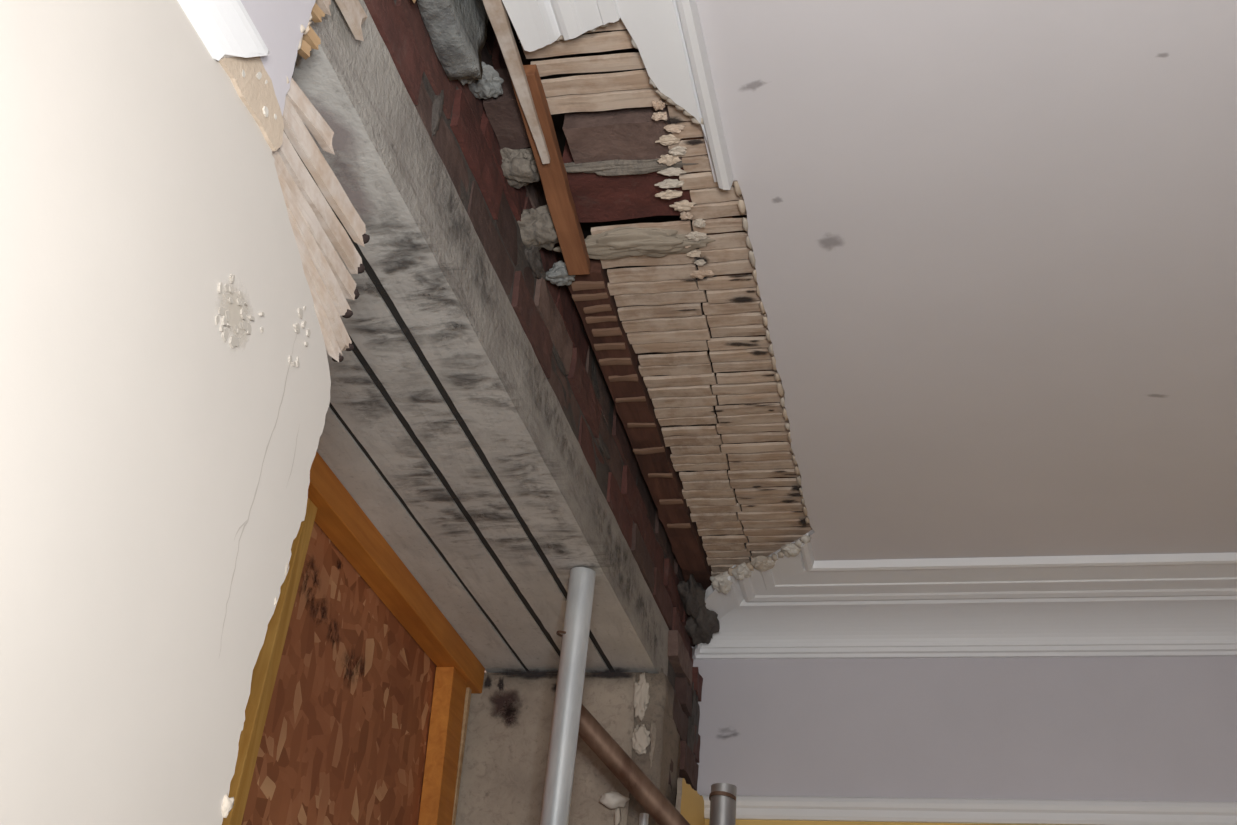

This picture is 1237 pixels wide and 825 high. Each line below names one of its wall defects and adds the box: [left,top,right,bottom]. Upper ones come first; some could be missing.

flaking render [219,56,290,151]
peeling [215,274,265,348]
spalling [649,78,811,594]